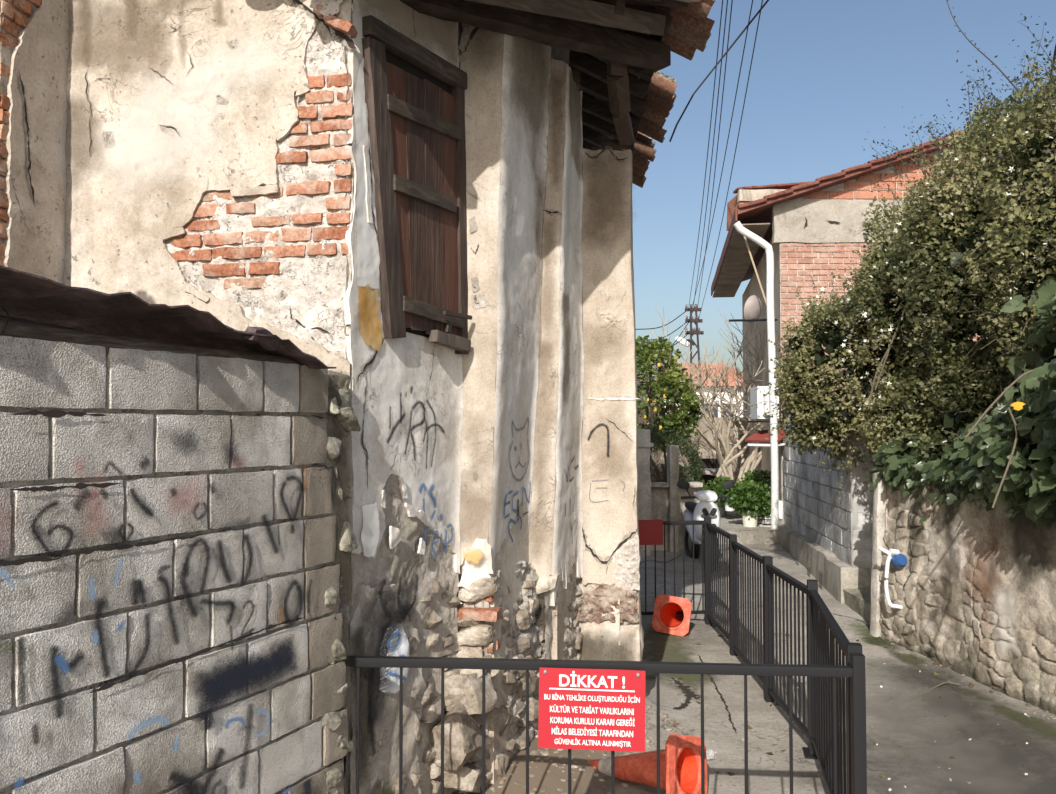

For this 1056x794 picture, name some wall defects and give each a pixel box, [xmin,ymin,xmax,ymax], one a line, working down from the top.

crack [289,0,360,53]
crack [18,69,36,206]
flaking render [159,21,380,358]
crack [356,336,399,490]
crack [313,464,337,501]
flaking render [351,474,511,657]
spalling [534,574,559,594]
crack [582,489,682,568]